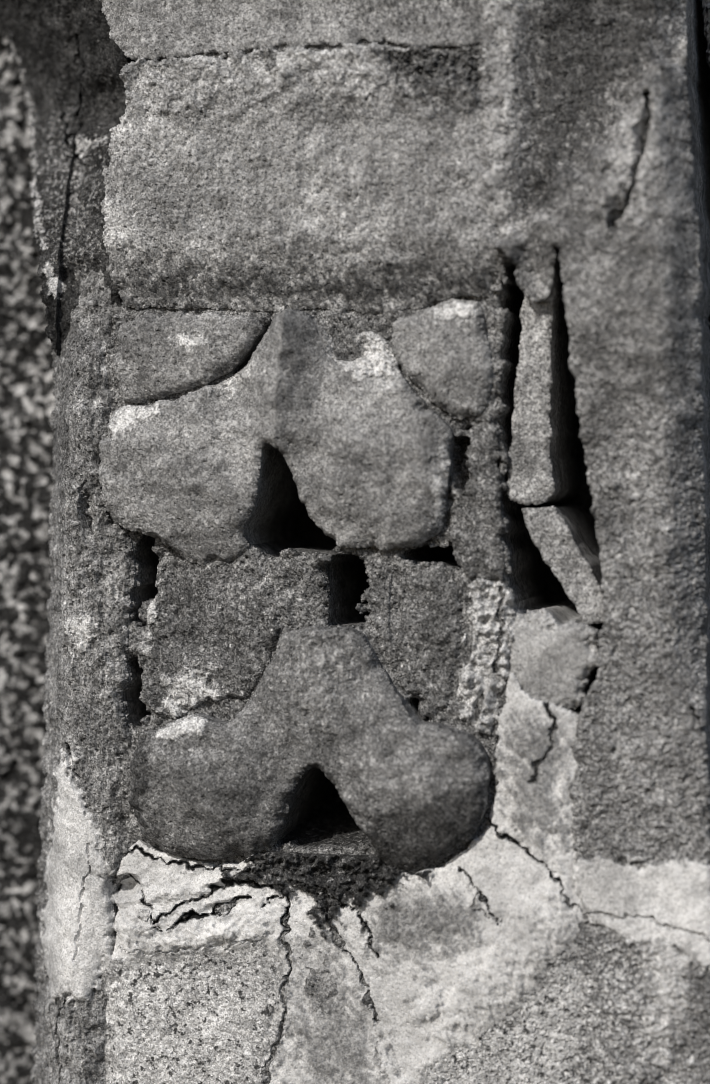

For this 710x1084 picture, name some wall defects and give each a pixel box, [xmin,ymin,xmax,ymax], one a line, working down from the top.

crack [529,702,558,783]
crack [489,735,582,909]
water stain [113,911,271,955]
crack [124,845,292,982]
crack [331,903,379,987]
water stain [270,701,578,1084]
crack [459,868,498,921]
water stain [633,935,701,1069]